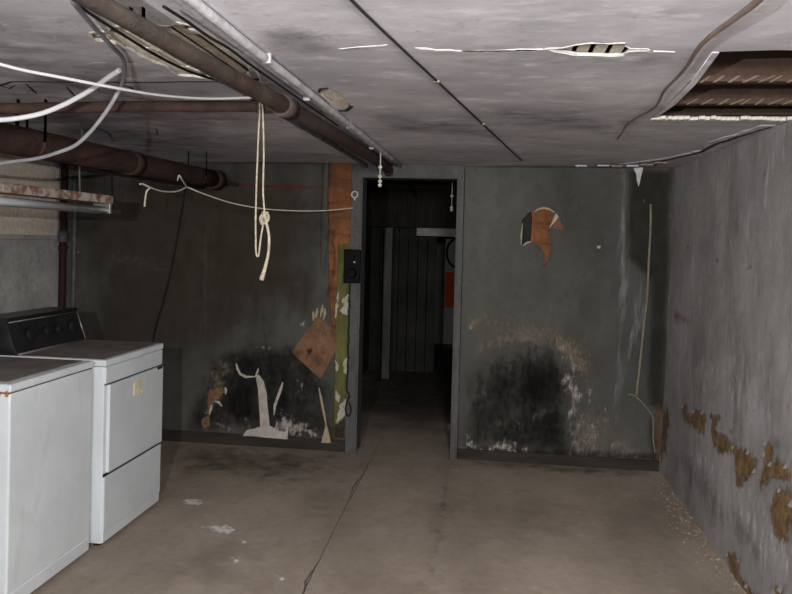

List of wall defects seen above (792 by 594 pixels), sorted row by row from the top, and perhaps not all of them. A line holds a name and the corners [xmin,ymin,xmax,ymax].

flaking render [84,26,210,79]
flaking render [145,12,251,76]
crack [338,43,388,51]
crack [415,46,549,54]
crack [633,47,675,55]
spalling [520,207,564,267]
peeling [292,243,350,443]
damp [195,347,323,438]
damp [479,327,635,454]
peeling [681,403,792,543]
crack [302,438,382,594]
peeling [725,552,754,594]